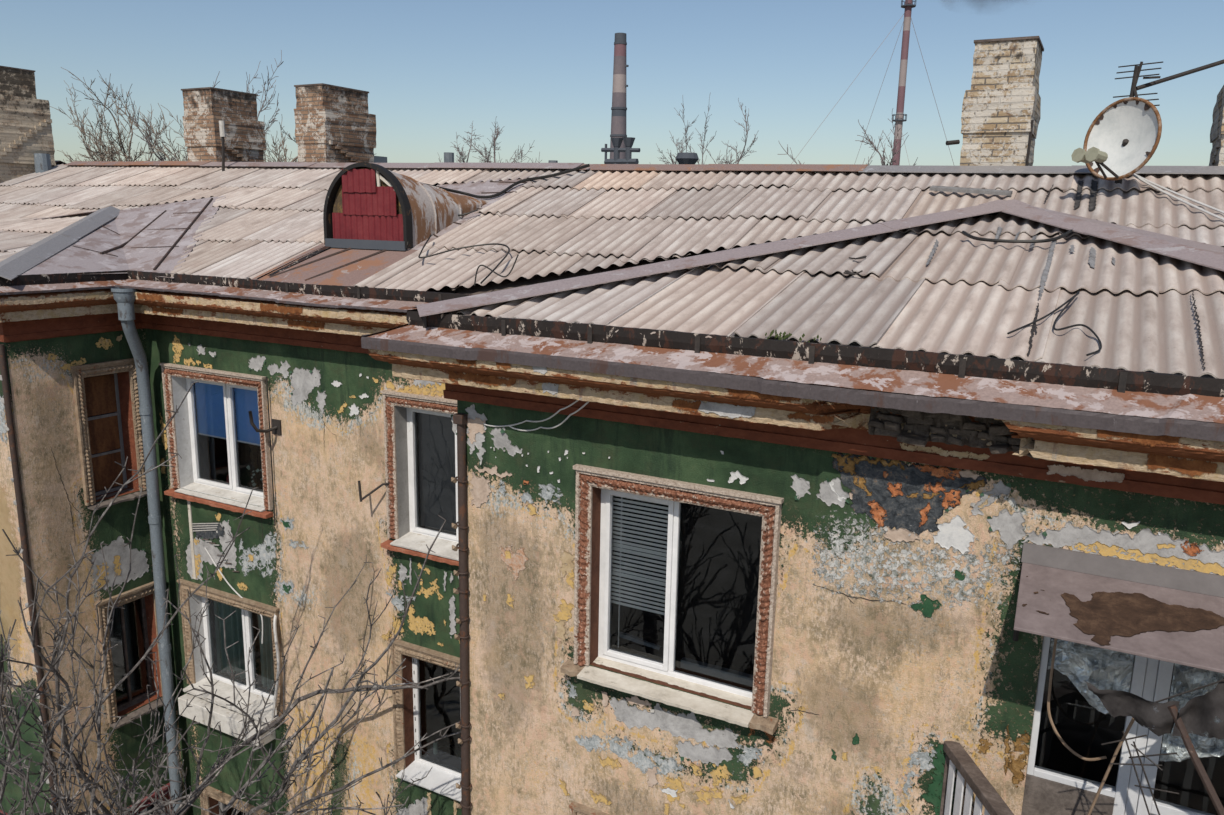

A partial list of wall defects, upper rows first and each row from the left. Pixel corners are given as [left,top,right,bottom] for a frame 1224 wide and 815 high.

corrosion [137,293,183,316]
corrosion [260,303,325,330]
peeling [248,355,445,416]
corrosion [448,359,516,387]
corrosion [672,399,701,412]
corrosion [727,388,834,424]
peeling [451,404,585,515]
spalling [790,390,1224,617]
peeling [186,513,309,596]
peeling [382,558,460,646]
peeling [1061,591,1224,646]
peeling [566,680,763,815]